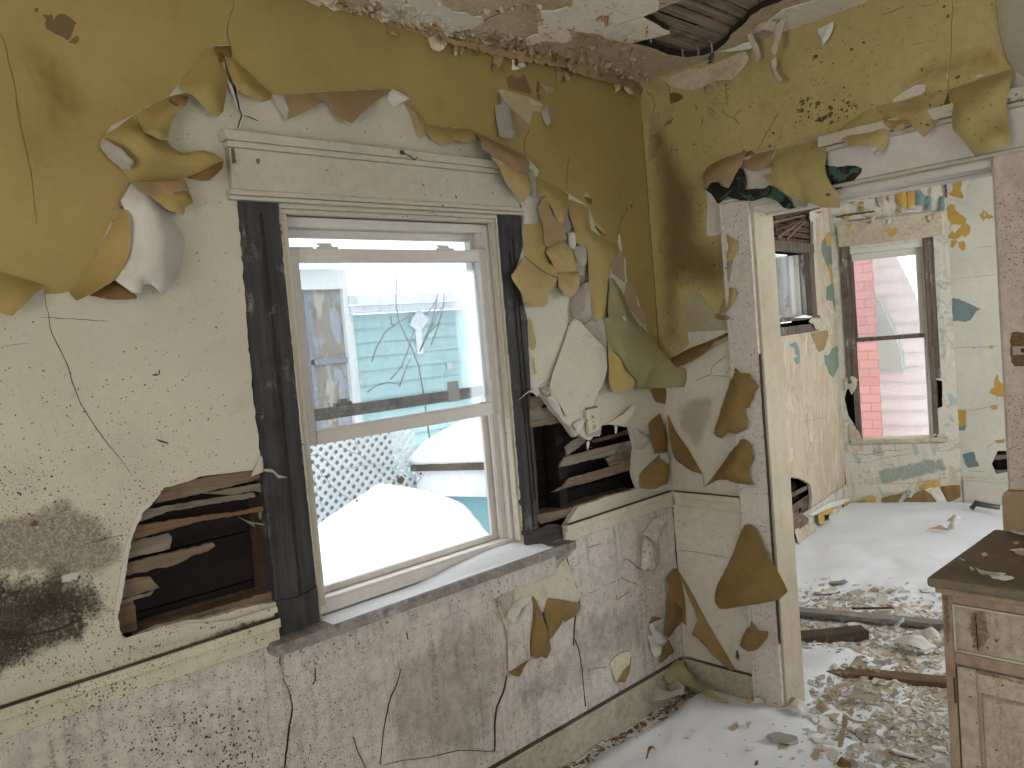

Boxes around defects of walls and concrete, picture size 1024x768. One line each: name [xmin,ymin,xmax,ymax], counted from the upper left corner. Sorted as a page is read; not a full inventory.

crack [233,83,259,130]
peeling [307,0,871,139]
peeling [840,182,970,251]
peeling [949,284,980,322]
crack [42,302,133,476]
hole [519,386,650,524]
hole [791,481,809,514]
peeling [963,452,979,468]
spalling [994,439,1007,474]
damp [0,476,124,691]
hole [113,455,287,648]
crack [353,669,508,768]